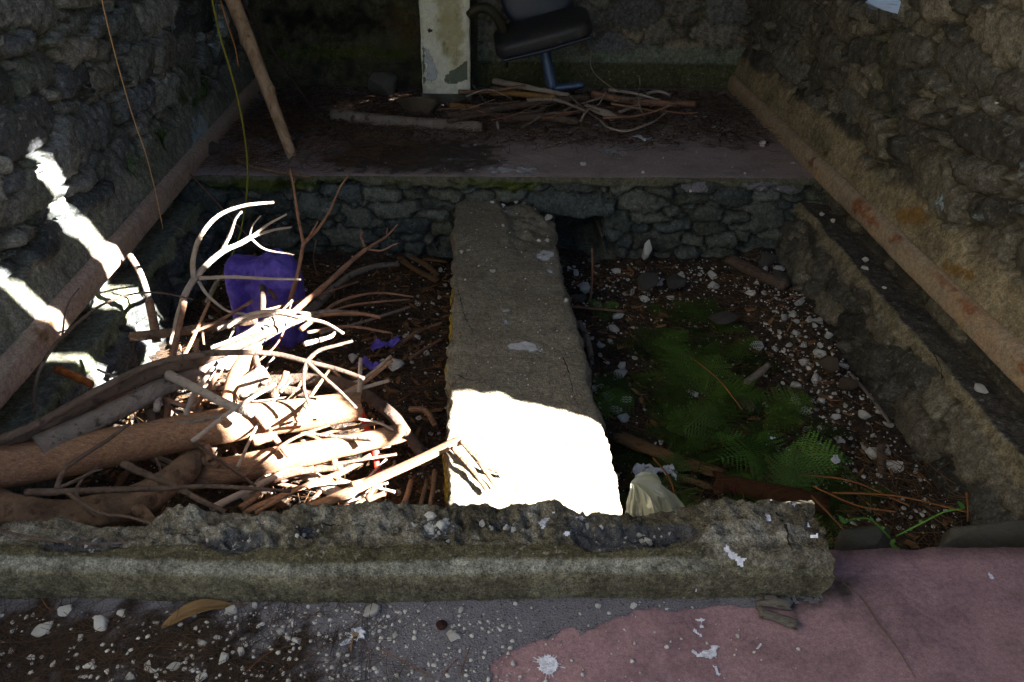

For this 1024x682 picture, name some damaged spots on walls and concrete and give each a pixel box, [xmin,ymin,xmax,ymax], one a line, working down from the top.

peeling [422,46,467,84]